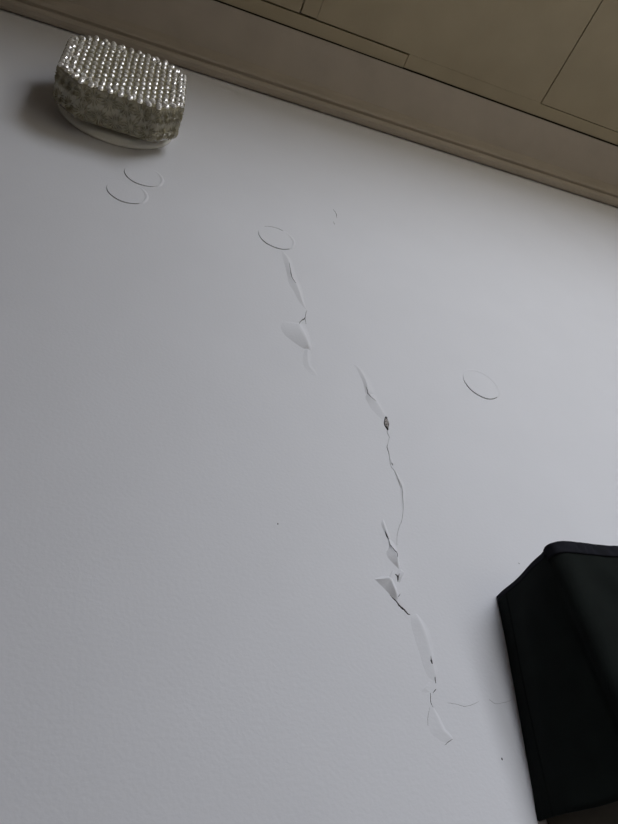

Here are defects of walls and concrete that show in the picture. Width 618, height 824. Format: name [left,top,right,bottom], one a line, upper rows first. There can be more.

crack [281,250,318,376]
crack [353,364,504,745]